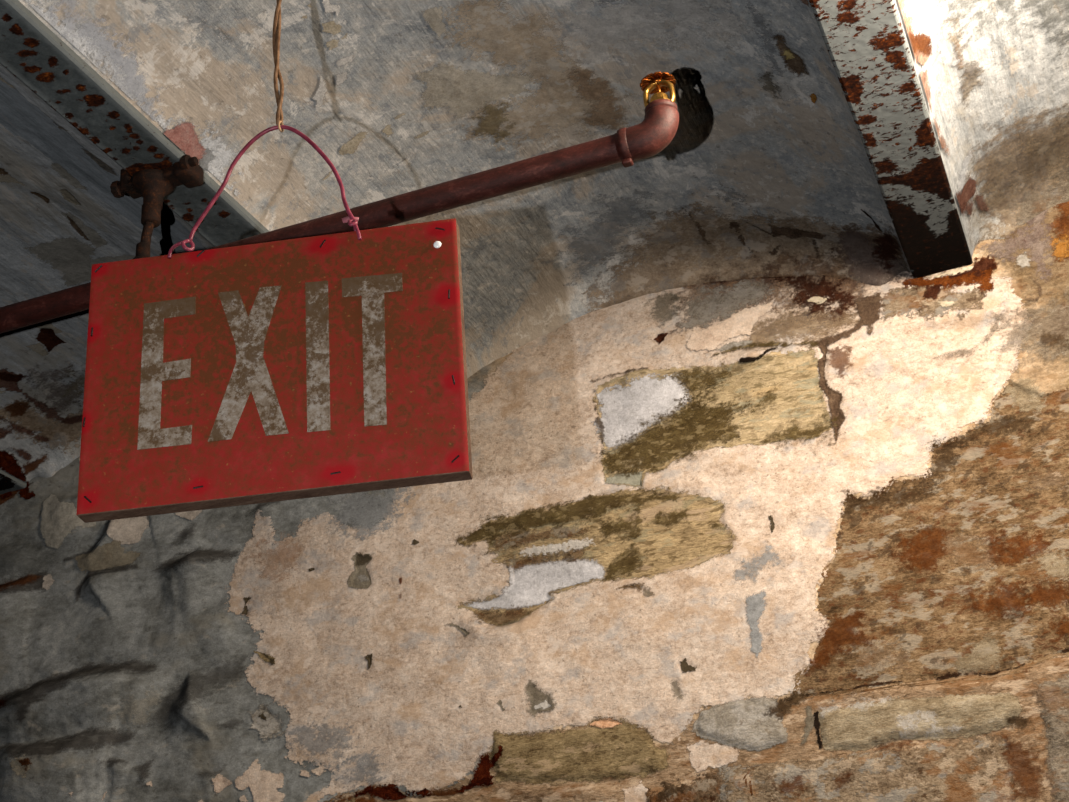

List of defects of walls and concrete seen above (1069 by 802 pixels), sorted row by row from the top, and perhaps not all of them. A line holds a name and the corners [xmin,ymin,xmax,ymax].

corrosion [162,122,215,170]
corrosion [894,255,998,300]
crack [714,320,865,441]
peeling [40,494,149,573]
peeling [176,510,202,520]
peeling [223,269,1069,802]
peeling [42,573,55,590]
peeling [212,759,285,802]